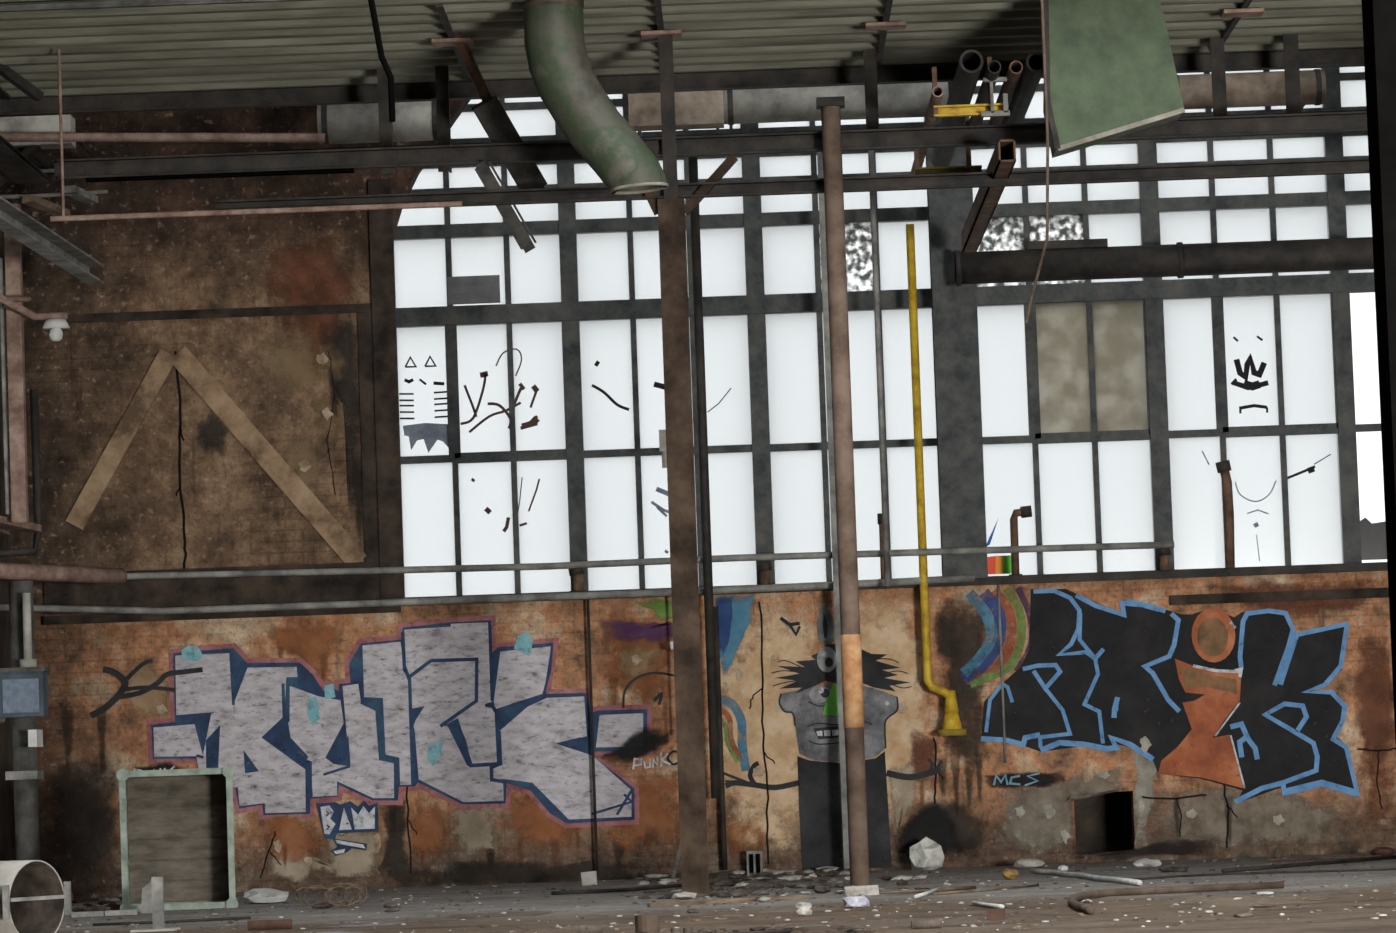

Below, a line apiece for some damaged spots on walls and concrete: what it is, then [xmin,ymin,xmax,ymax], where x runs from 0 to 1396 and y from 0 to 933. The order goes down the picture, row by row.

leakage [55,712,116,873]
peeling [1003,736,1346,854]
peeling [272,832,381,882]